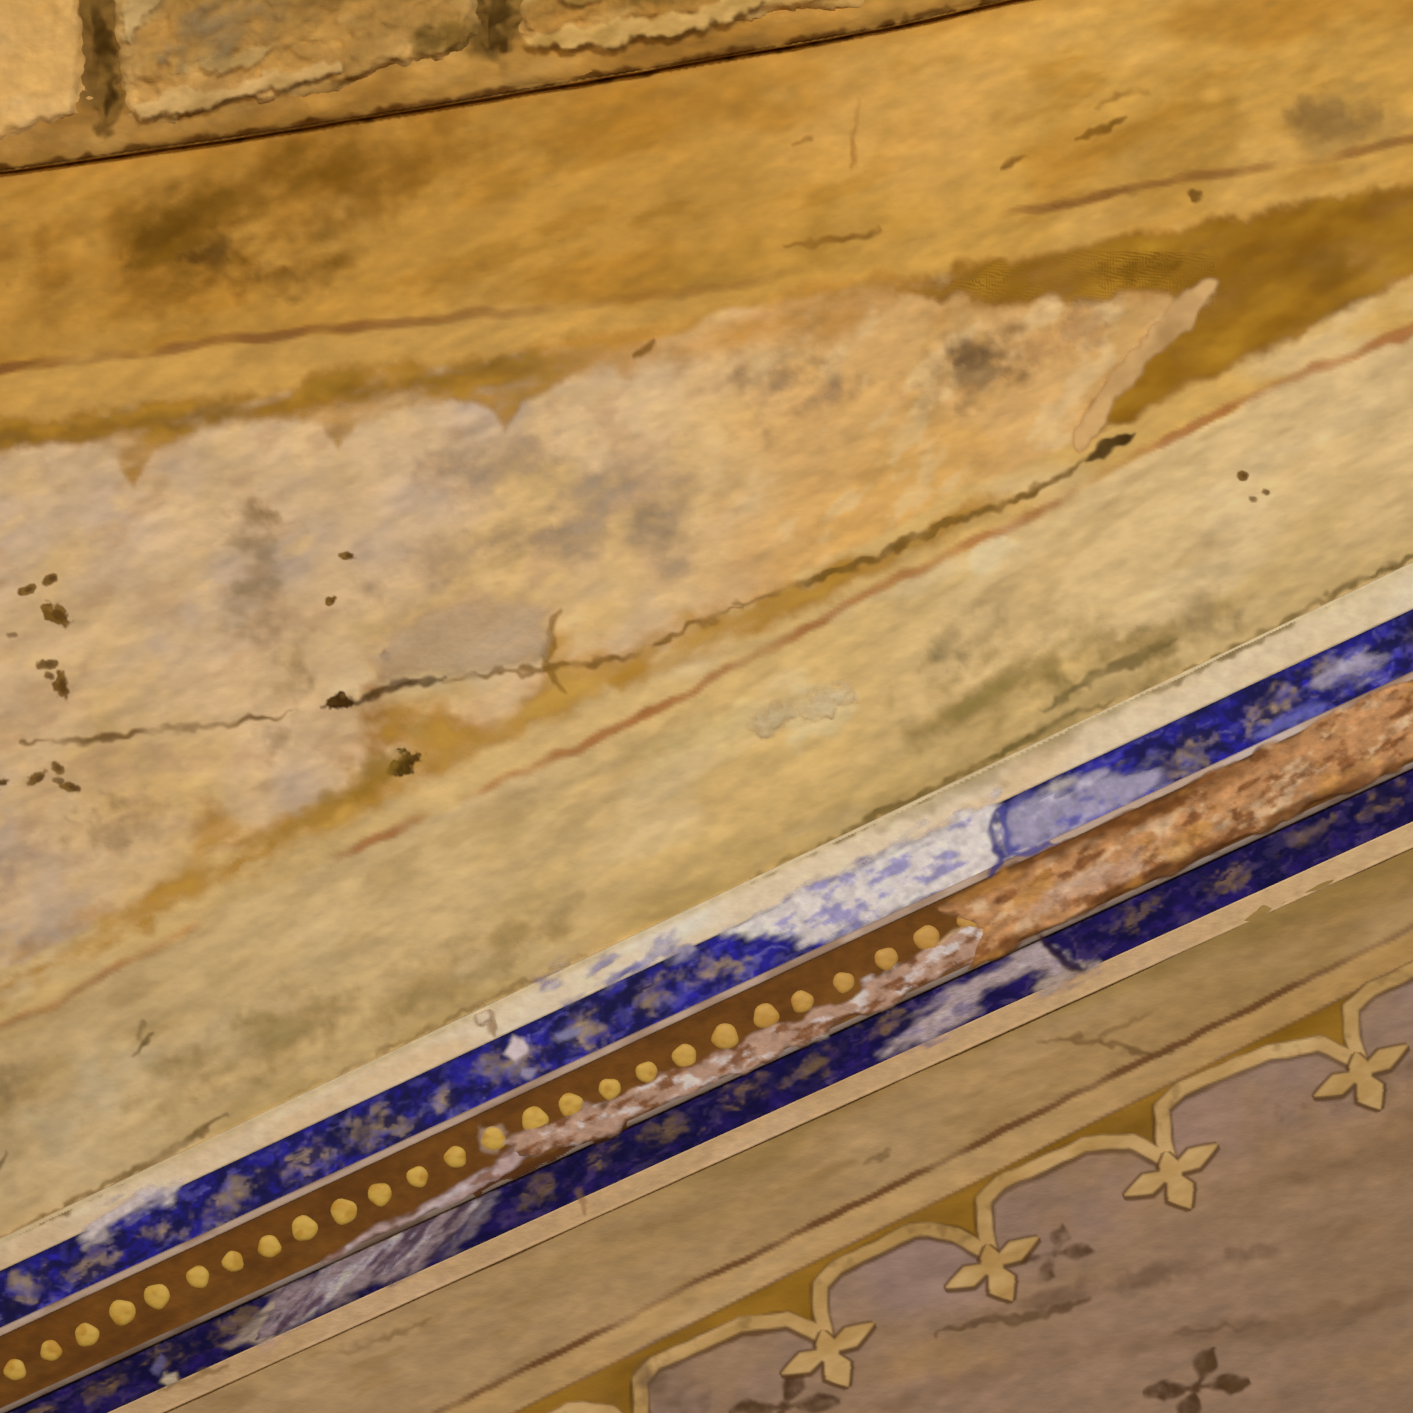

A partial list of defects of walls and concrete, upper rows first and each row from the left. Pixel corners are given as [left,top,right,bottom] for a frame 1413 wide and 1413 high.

damp [125,192,261,268]
damp [955,349,999,388]
crack [805,434,1134,586]
flaking render [18,574,69,627]
crack [484,615,622,679]
flaking render [37,660,69,698]
crack [324,679,435,707]
crack [78,730,139,743]
flaking render [28,762,80,791]
crack [839,776,956,841]
peeling [230,646,1413,1347]
peeling [152,1356,178,1386]